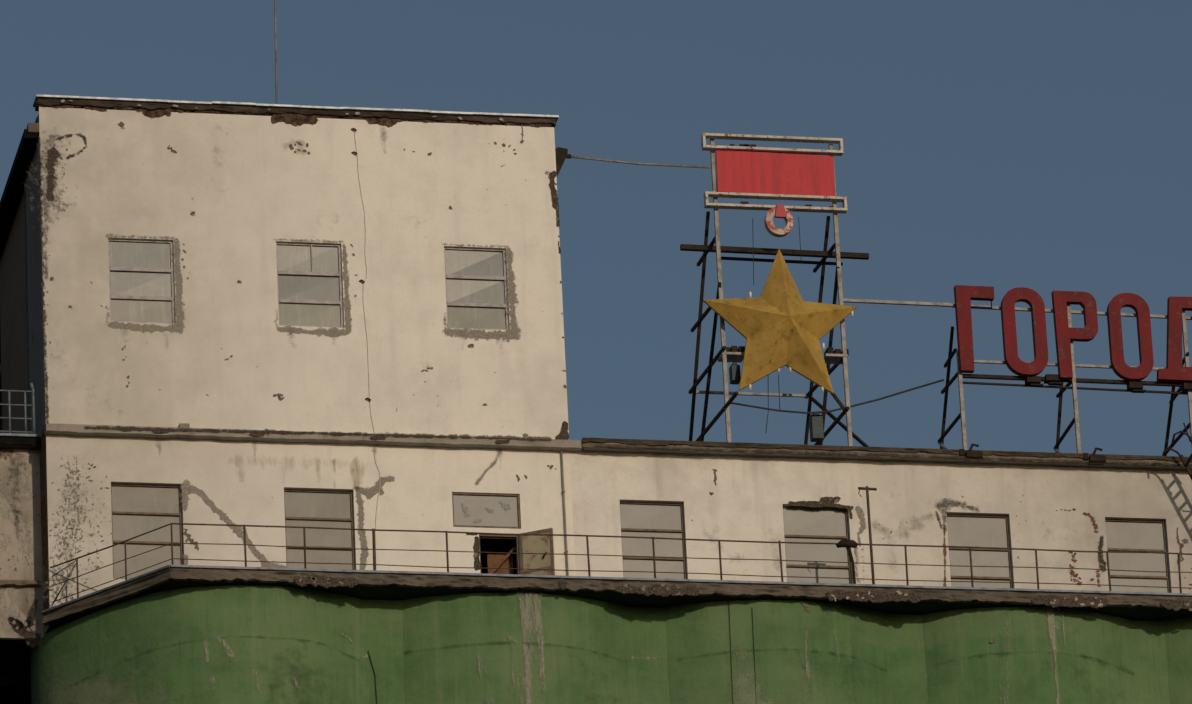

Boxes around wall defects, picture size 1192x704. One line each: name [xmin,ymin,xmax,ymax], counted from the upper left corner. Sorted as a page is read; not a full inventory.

spalling [35,99,552,155]
peeling [0,456,112,648]
spalling [616,583,699,597]
leakage [508,592,545,704]